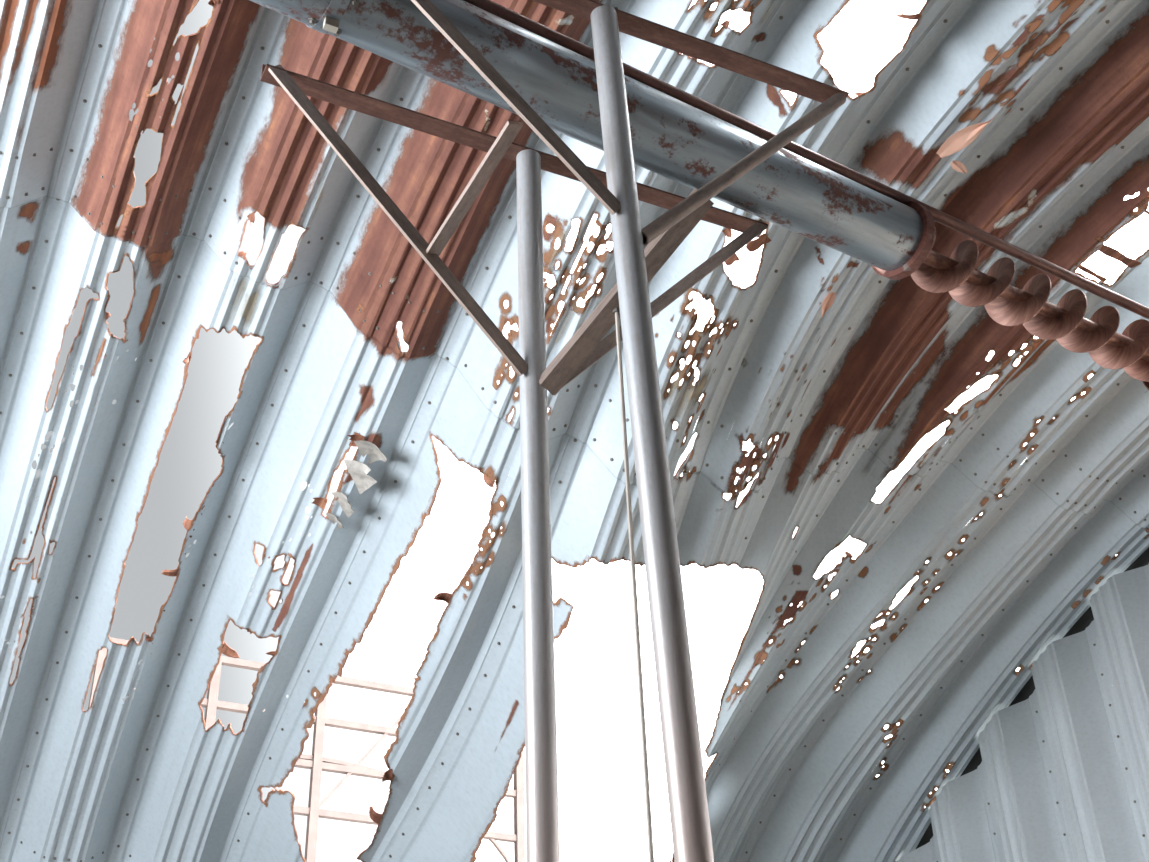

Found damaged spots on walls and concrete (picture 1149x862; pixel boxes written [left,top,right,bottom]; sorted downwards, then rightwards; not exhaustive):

rust [0,0,69,91]
rust [71,0,260,345]
rust [237,86,349,229]
rust [858,0,1149,290]
rust [335,129,516,362]
peeling [347,432,365,447]
rust [728,275,1056,513]
peeling [312,497,328,510]
peeling [433,592,453,604]
peeling [221,641,240,658]
peeling [382,756,394,782]
peeling [369,806,382,824]